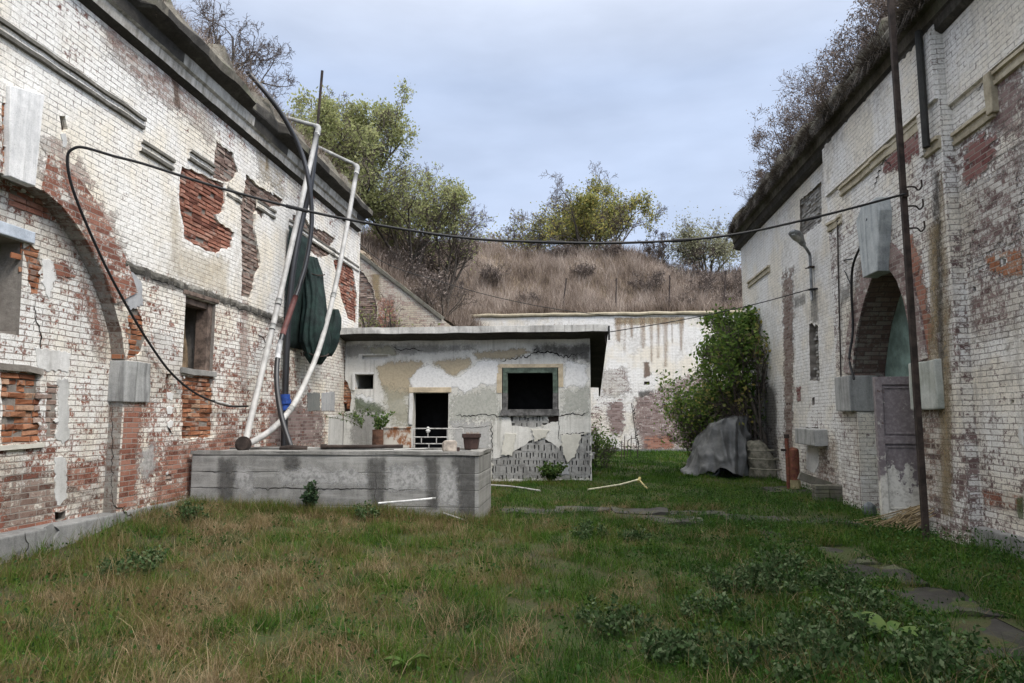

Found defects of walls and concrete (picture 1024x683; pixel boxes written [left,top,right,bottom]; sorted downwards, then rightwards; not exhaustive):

peeling [36,116,132,263]
flaking render [99,20,288,394]
flaking render [292,213,400,328]
peeling [883,131,919,175]
peeling [960,66,1024,349]
flaking render [1,187,237,510]
peeling [370,346,528,426]
crack [503,348,584,362]
peeling [781,265,820,455]
water stain [219,460,254,505]